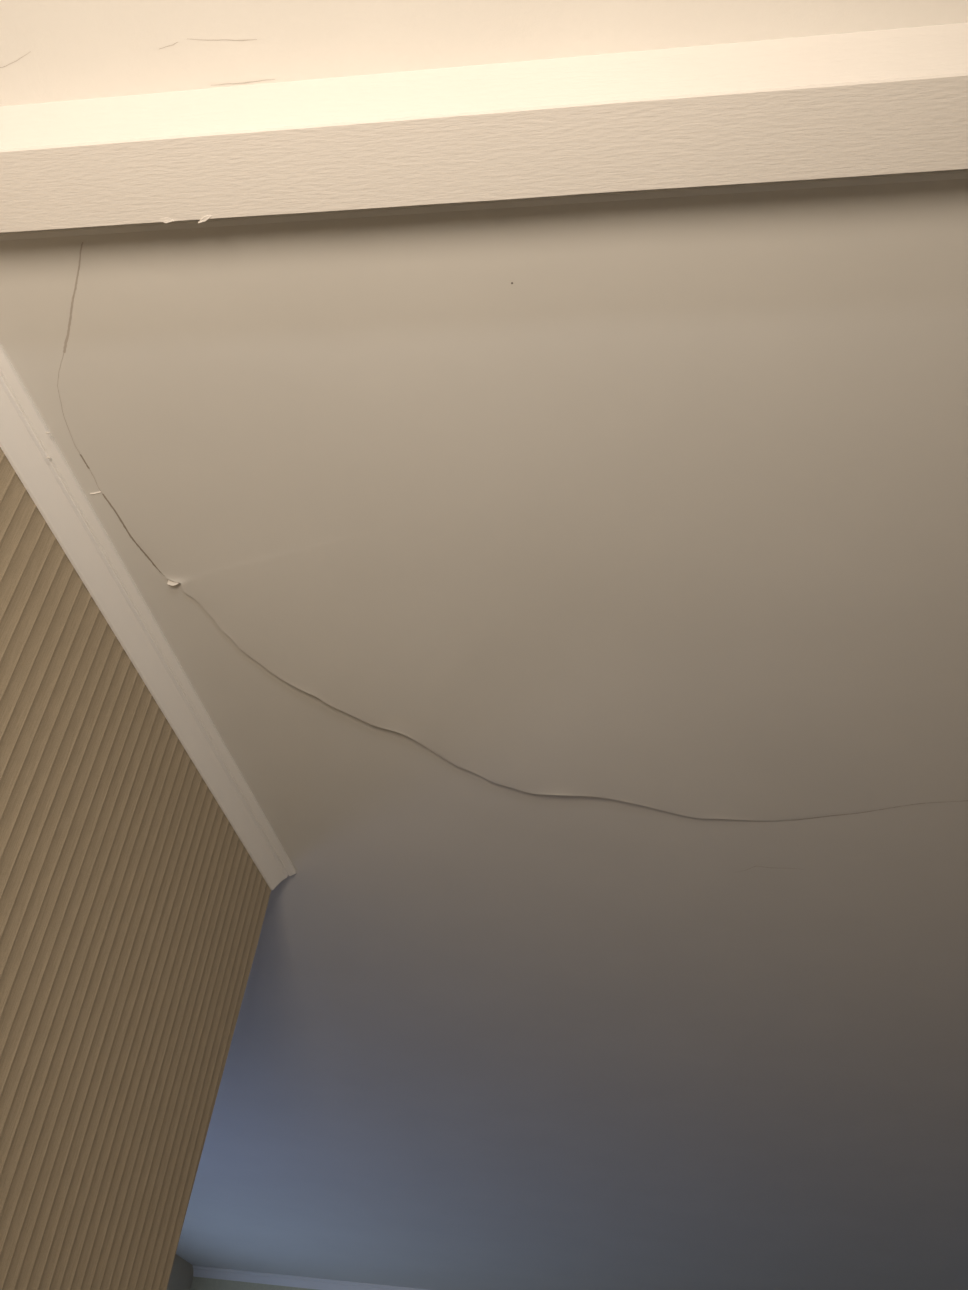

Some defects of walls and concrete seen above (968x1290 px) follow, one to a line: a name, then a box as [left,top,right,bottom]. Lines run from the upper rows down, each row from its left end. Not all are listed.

crack [57,242,968,821]